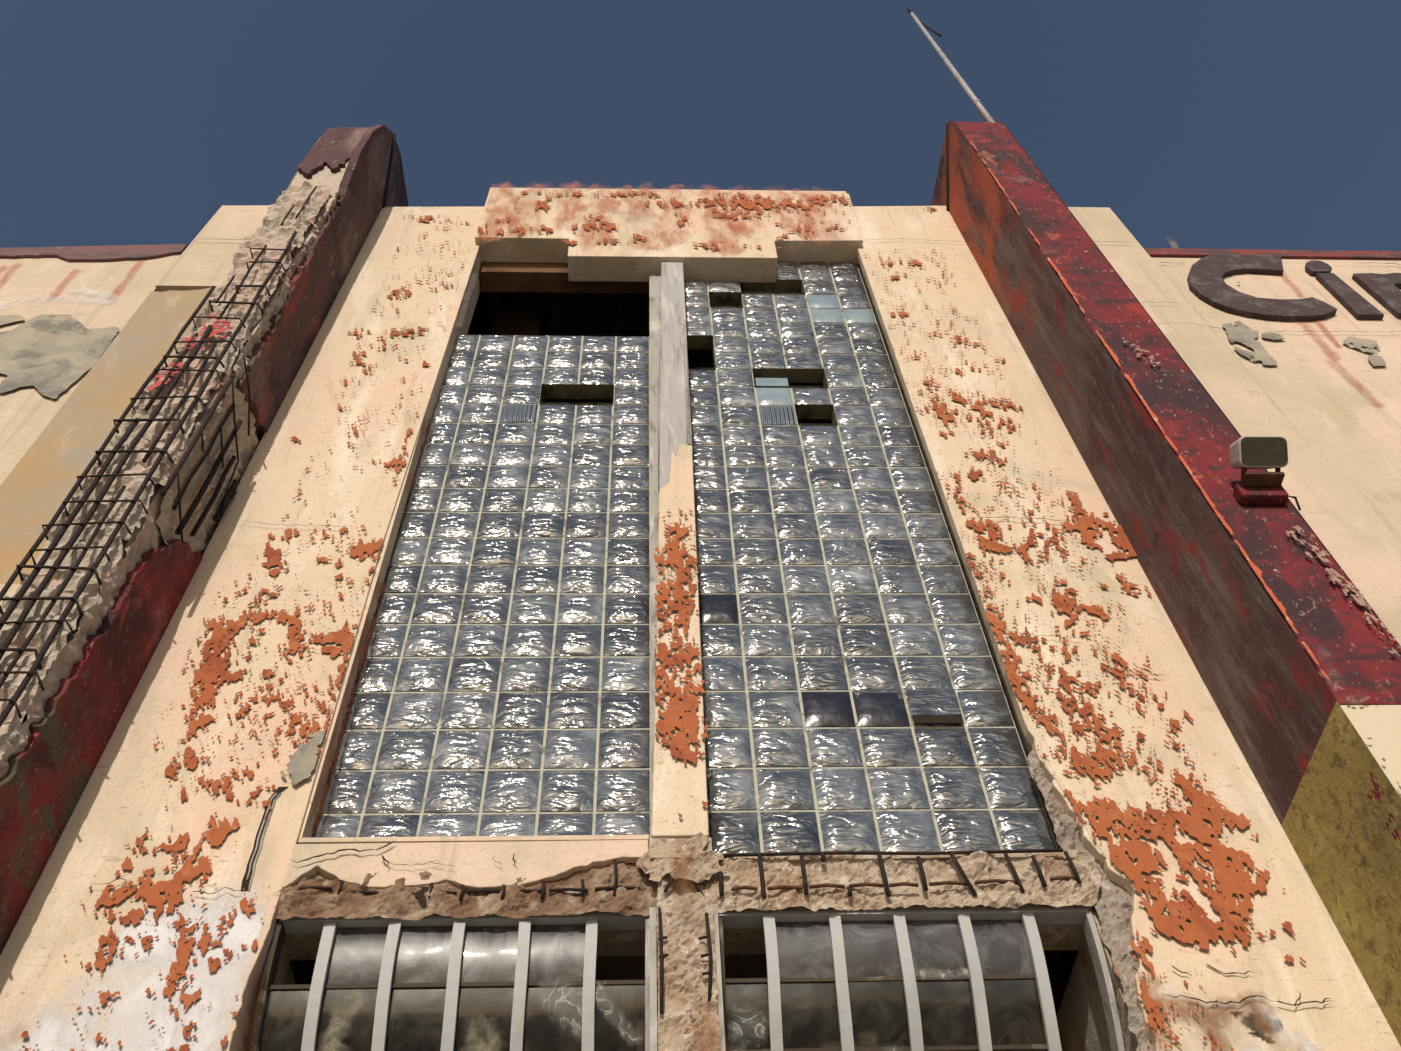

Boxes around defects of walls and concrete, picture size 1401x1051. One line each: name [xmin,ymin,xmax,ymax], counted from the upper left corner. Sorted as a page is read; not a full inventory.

spalling [0,181,344,778]
peeling [970,141,1331,682]
spalling [56,190,1295,1051]
crack [192,787,287,894]
crack [293,840,456,867]
water stain [2,890,264,1051]
crack [1167,964,1334,1006]